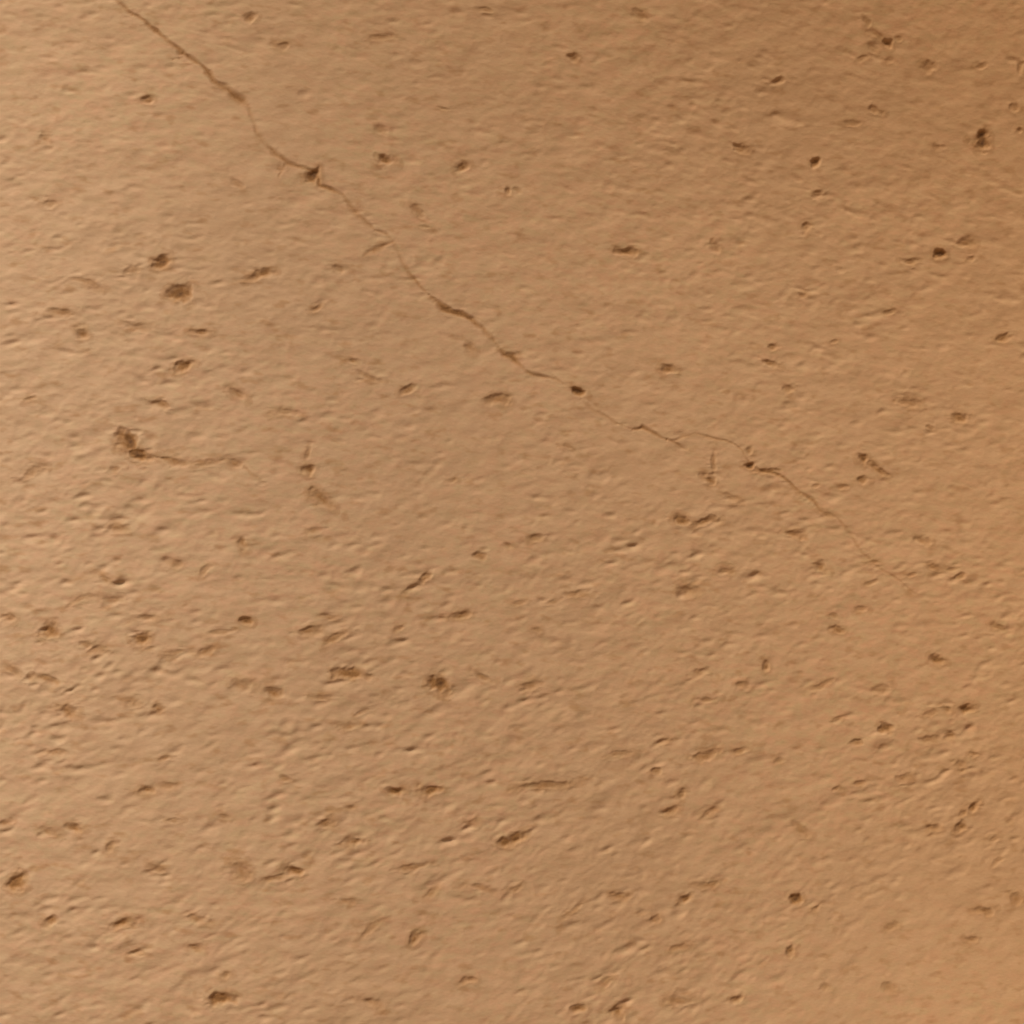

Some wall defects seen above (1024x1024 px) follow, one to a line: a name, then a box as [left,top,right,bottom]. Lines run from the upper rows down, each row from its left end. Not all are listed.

crack [107,0,944,616]